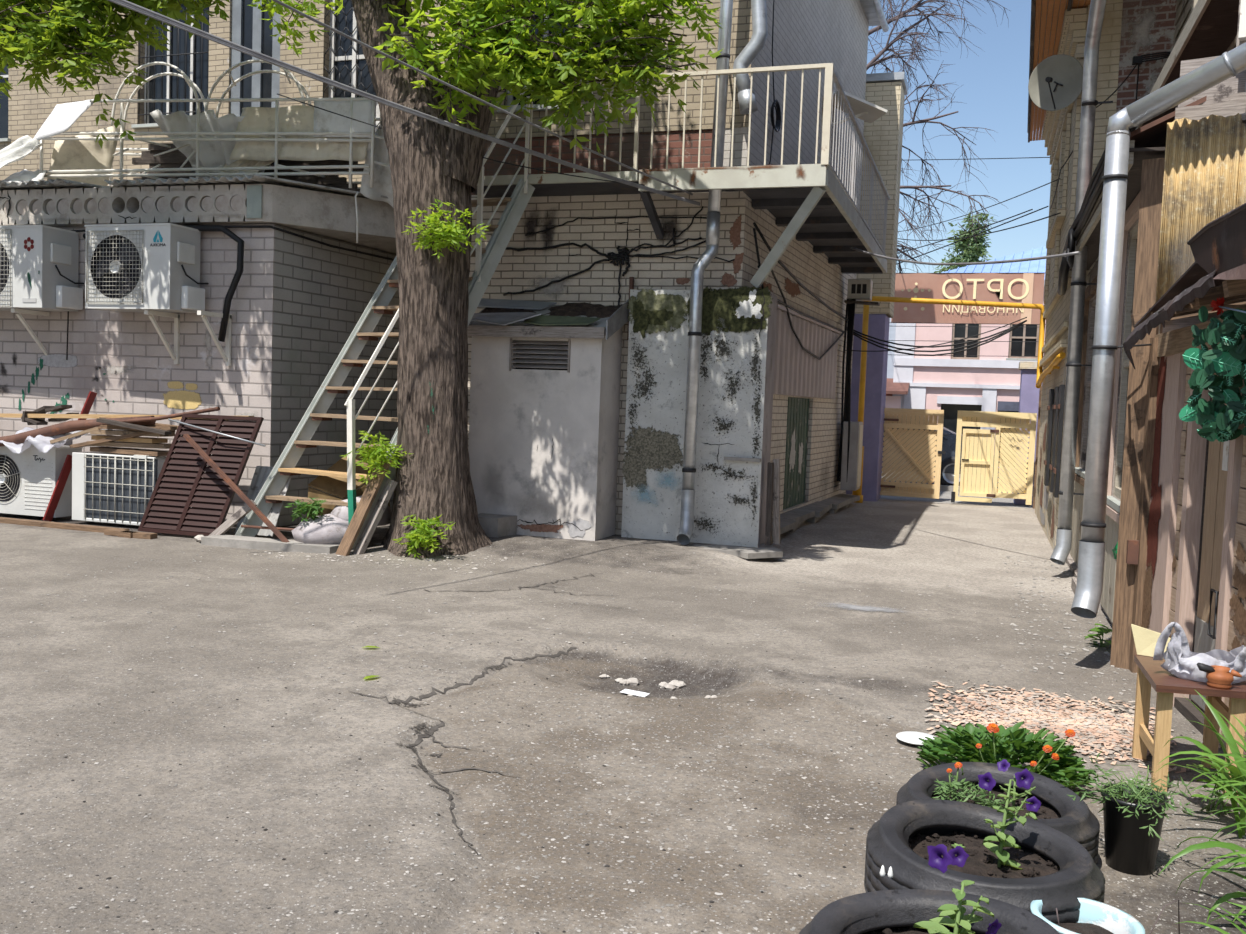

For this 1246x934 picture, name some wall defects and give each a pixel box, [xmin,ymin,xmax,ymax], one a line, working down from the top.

damp [627,286,772,338]
spalling [517,519,591,538]
peeling [1229,541,1246,650]
crack [388,647,577,854]